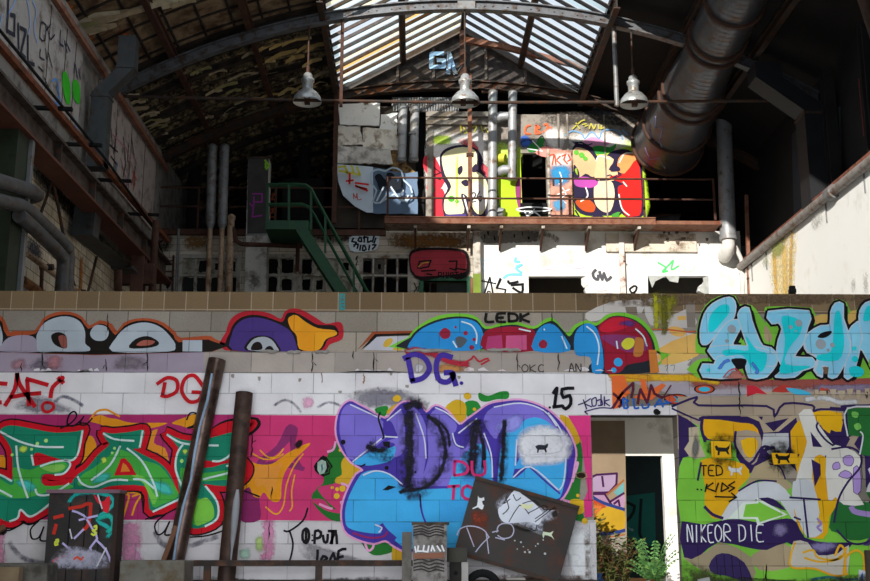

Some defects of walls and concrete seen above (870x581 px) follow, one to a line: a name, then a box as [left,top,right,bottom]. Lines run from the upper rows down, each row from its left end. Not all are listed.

corrosion [769,235,796,294]
peeling [648,276,679,287]
peeling [699,275,709,294]